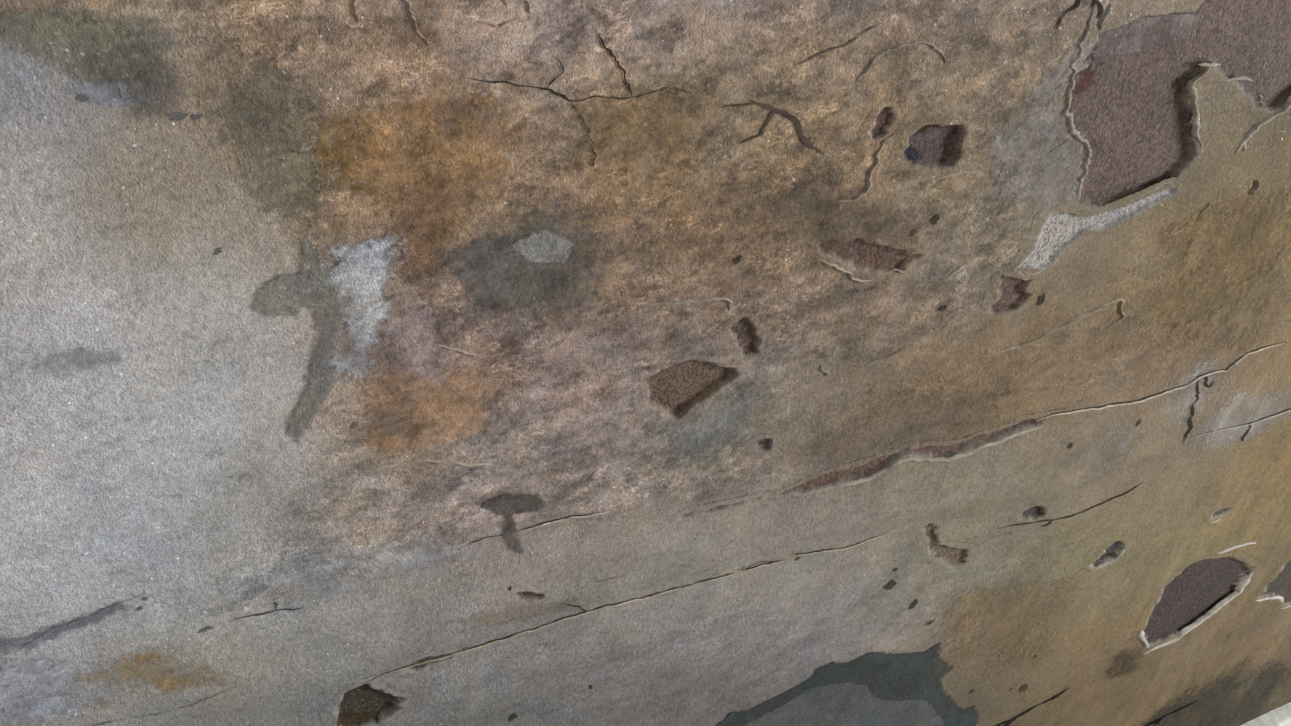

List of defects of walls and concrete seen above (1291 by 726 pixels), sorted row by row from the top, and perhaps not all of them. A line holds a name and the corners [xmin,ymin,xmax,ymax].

crack [1056,0,1104,29]
crack [468,31,692,167]
crack [722,100,824,154]
spalling [836,101,983,202]
spalling [980,0,1291,322]
rust [316,90,525,455]
crack [1035,342,1291,444]
crack [366,527,908,684]
spalling [1130,542,1291,654]
leakage [0,601,126,724]
spalling [319,648,460,726]
leakage [1142,651,1291,726]